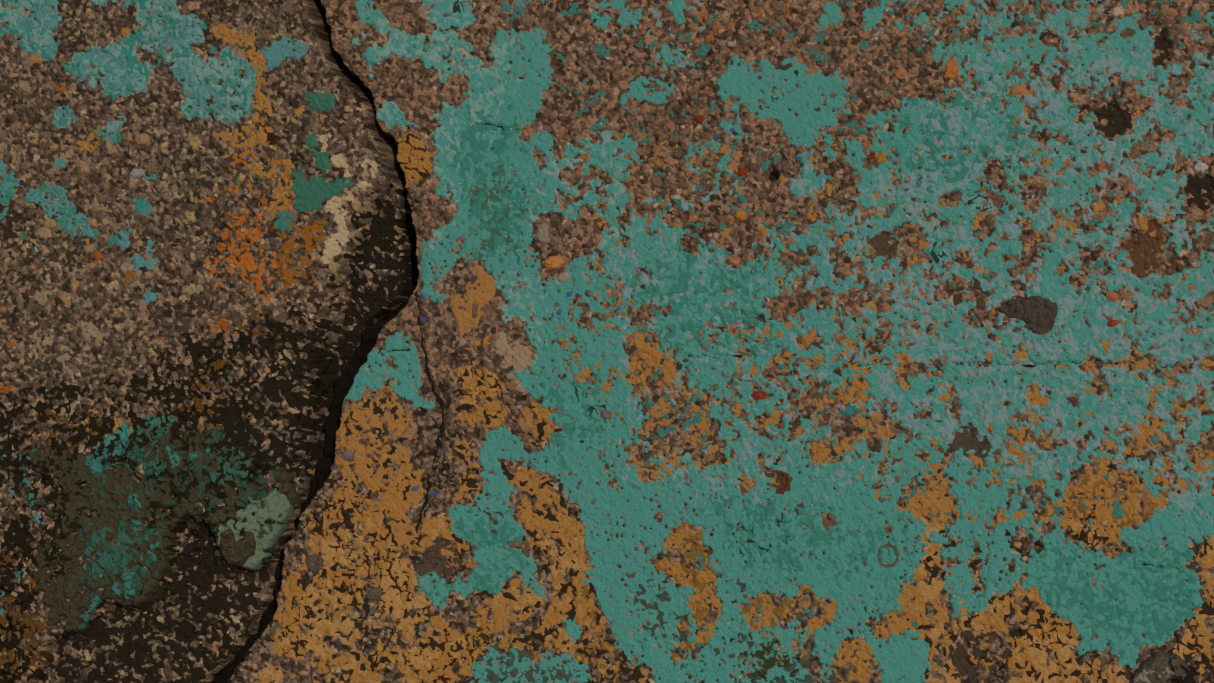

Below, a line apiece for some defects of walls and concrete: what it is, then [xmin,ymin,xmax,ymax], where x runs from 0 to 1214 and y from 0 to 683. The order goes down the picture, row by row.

crack [452,0,464,14]
spalling [1154,27,1173,66]
crack [314,0,428,182]
crack [256,108,287,145]
spalling [1097,102,1133,137]
spalling [318,134,378,264]
spalling [1184,174,1214,211]
spalling [1125,217,1180,279]
spalling [494,331,534,378]
crack [210,210,549,683]
spalling [948,425,992,459]
spalling [764,470,793,494]